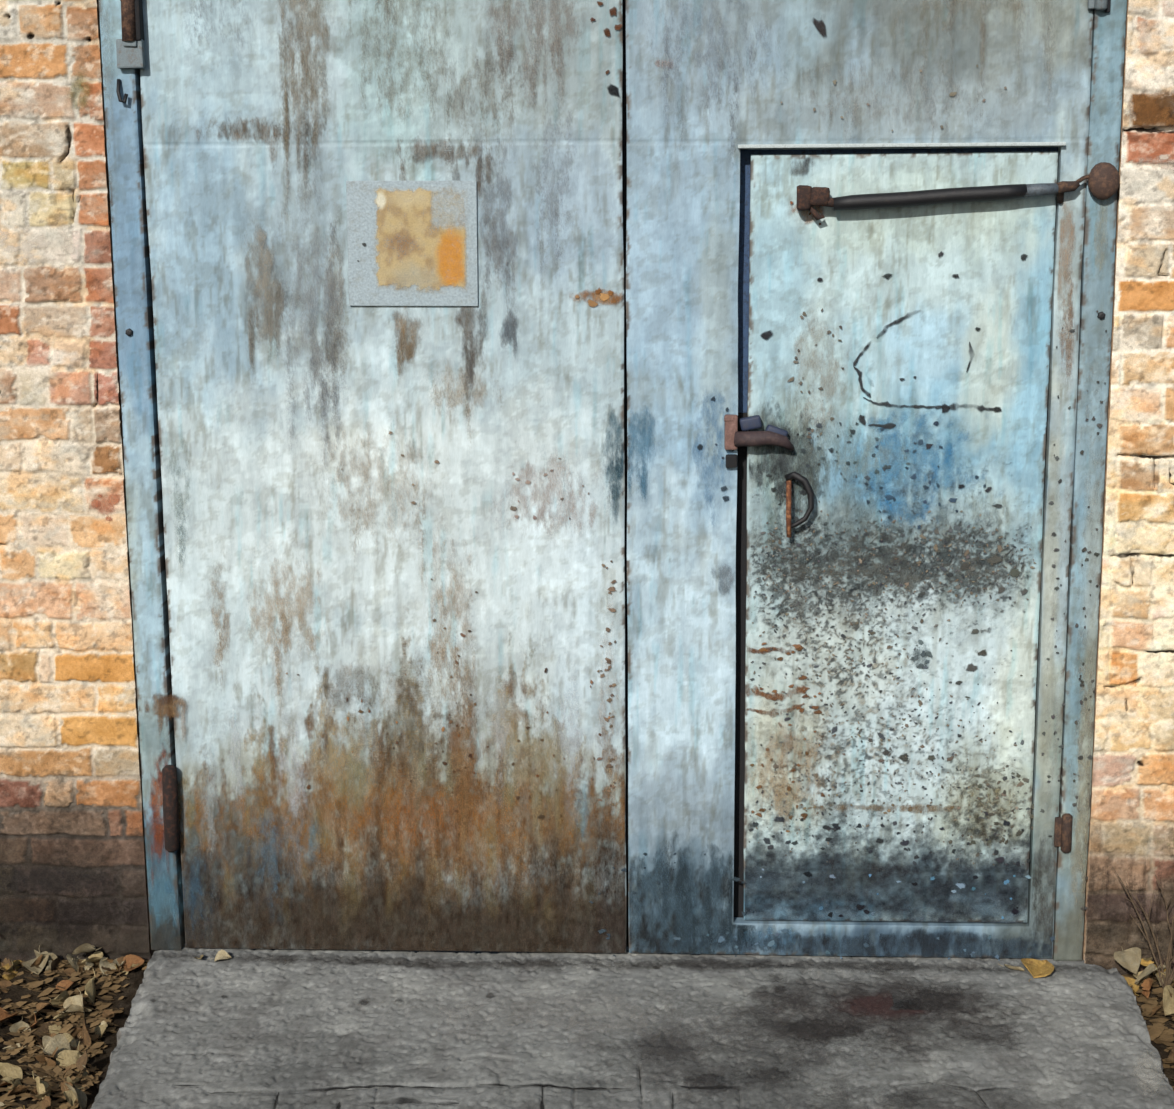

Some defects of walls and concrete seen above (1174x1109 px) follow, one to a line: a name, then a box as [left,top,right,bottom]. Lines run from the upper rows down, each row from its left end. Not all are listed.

corrosion [590,1,622,37]
corrosion [605,70,619,96]
corrosion [575,288,621,307]
corrosion [145,641,625,953]
damp [0,807,180,962]
damp [613,807,1055,961]
damp [1085,876,1174,975]
crack [312,1070,641,1109]
crack [672,1085,726,1105]